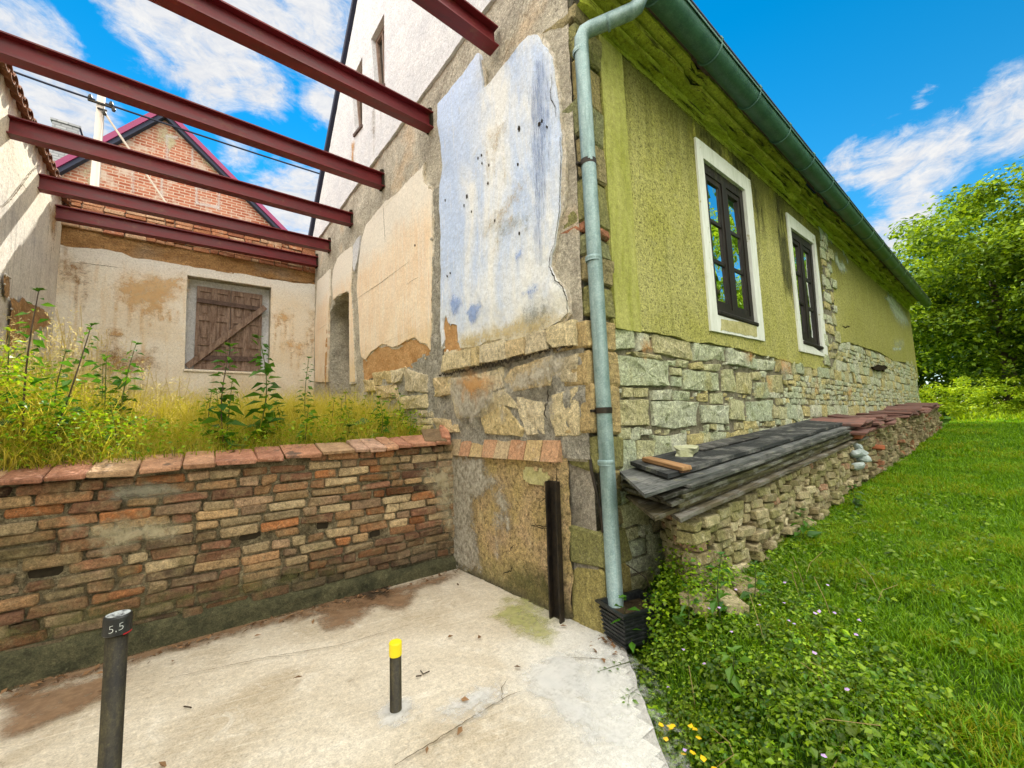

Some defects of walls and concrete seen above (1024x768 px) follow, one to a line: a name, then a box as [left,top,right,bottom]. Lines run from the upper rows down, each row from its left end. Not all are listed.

spalling [4,273,51,348]
spalling [362,187,481,380]
damp [776,200,792,295]
damp [127,574,449,662]
damp [495,605,551,639]
damp [0,663,103,737]